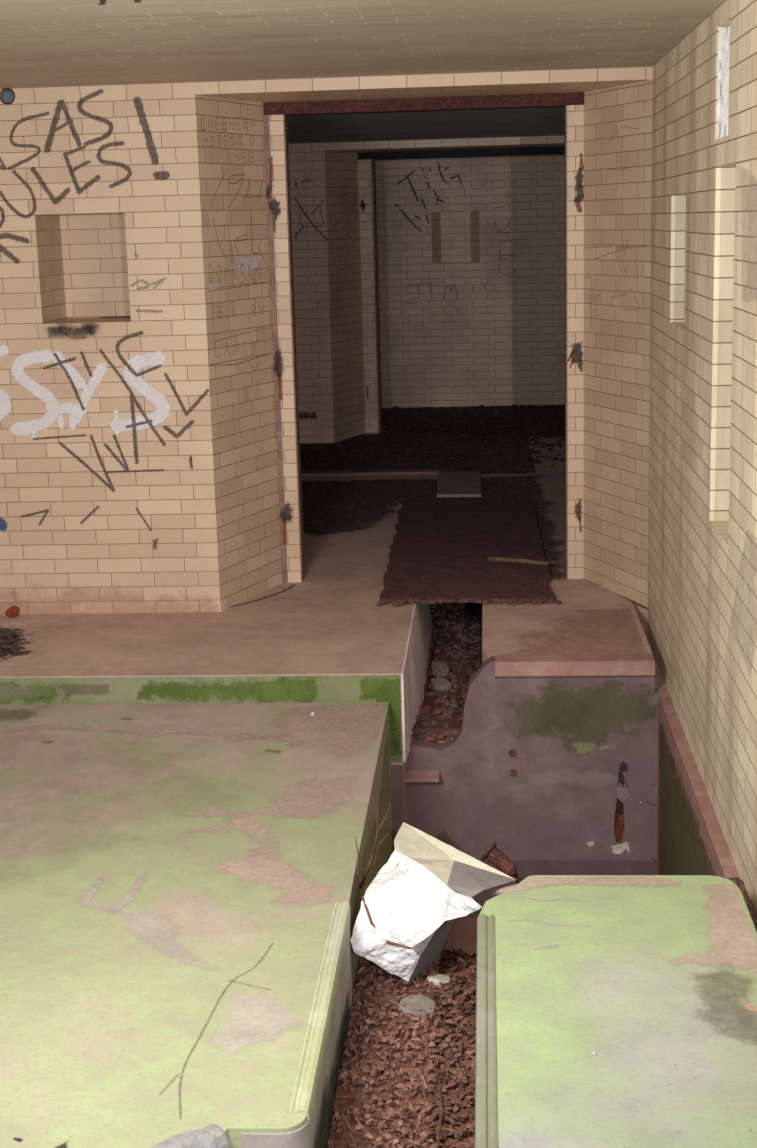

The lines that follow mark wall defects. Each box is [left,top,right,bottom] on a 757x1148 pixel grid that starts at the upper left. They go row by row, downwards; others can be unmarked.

spalling [150,1123,230,1148]